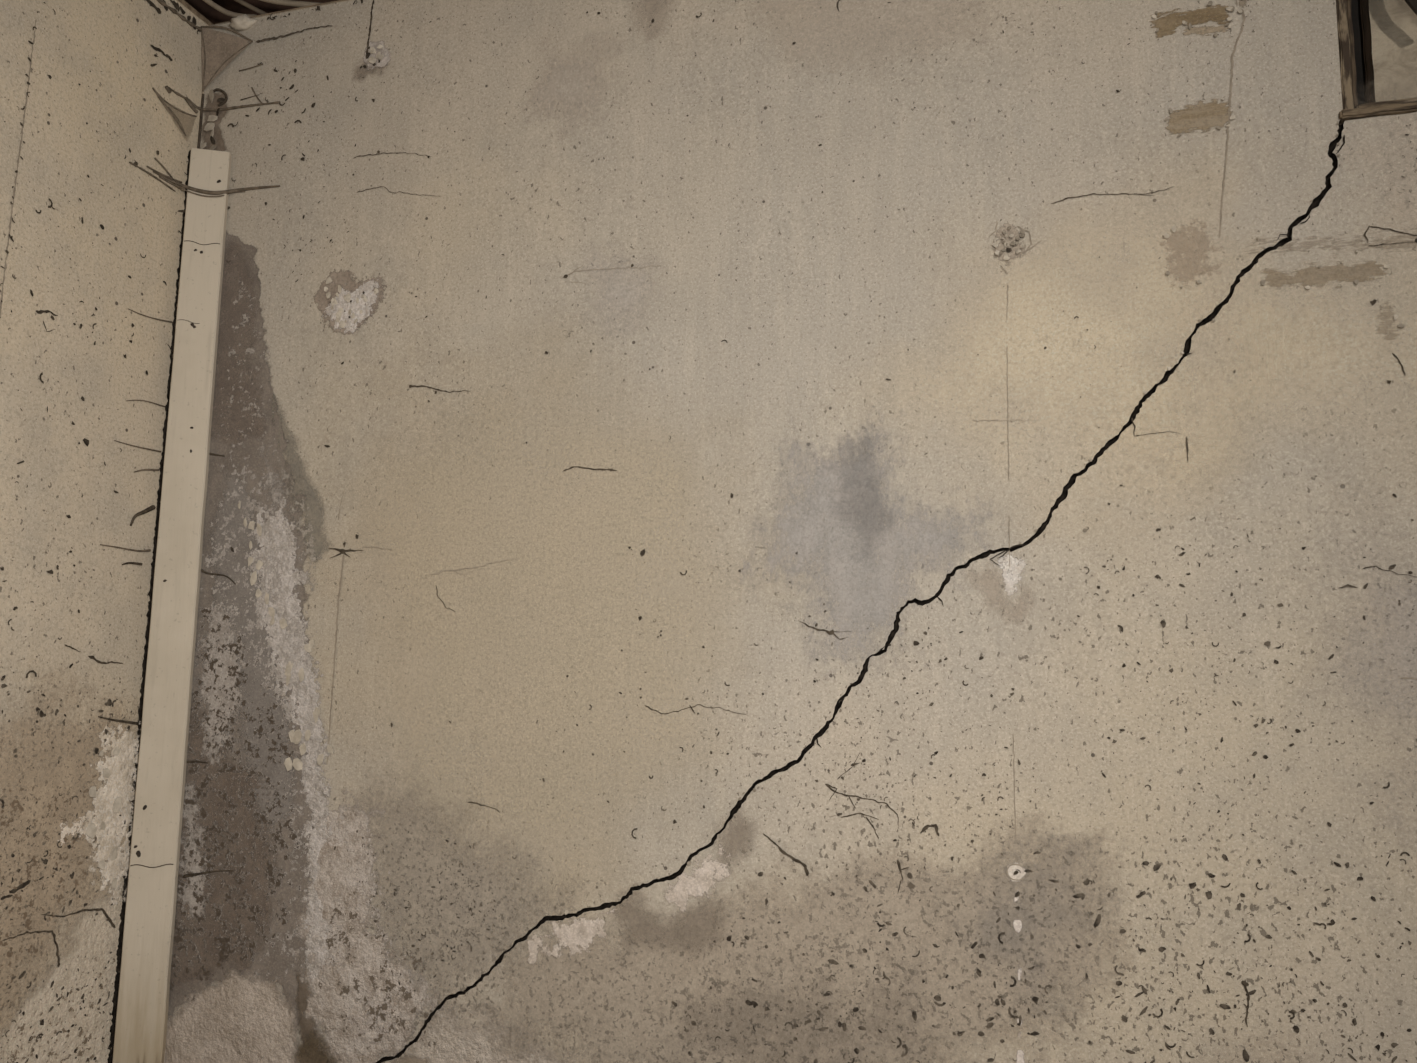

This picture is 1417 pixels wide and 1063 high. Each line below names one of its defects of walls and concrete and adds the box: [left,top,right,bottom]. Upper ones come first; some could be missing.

spalling [314,270,387,335]
crack [354,150,434,196]
damp [168,232,1100,1063]
crack [376,121,1345,1063]
damp [0,708,142,1063]